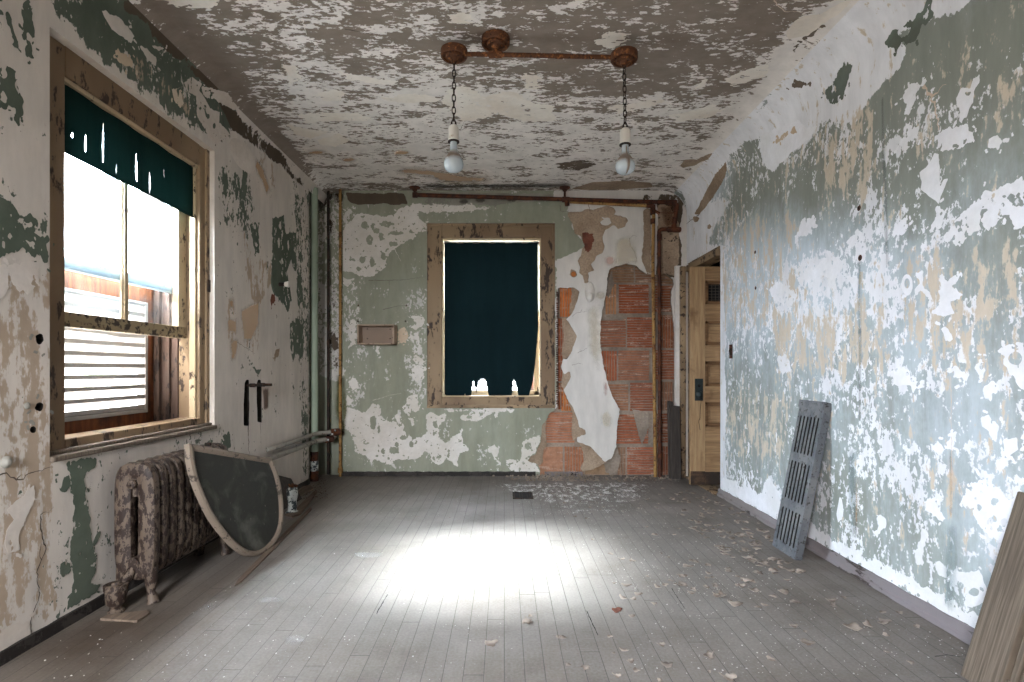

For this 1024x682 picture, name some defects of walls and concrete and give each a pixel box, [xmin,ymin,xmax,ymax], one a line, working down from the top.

peeling [786,62,852,104]
peeling [891,75,1024,247]
peeling [0,197,54,298]
peeling [342,192,553,287]
peeling [344,315,514,467]
flaking render [486,204,679,475]
crack [0,467,49,481]
crack [30,510,51,634]
peeling [55,457,101,610]
peeling [681,476,806,606]
peeling [807,489,987,628]
peeling [959,468,1022,543]